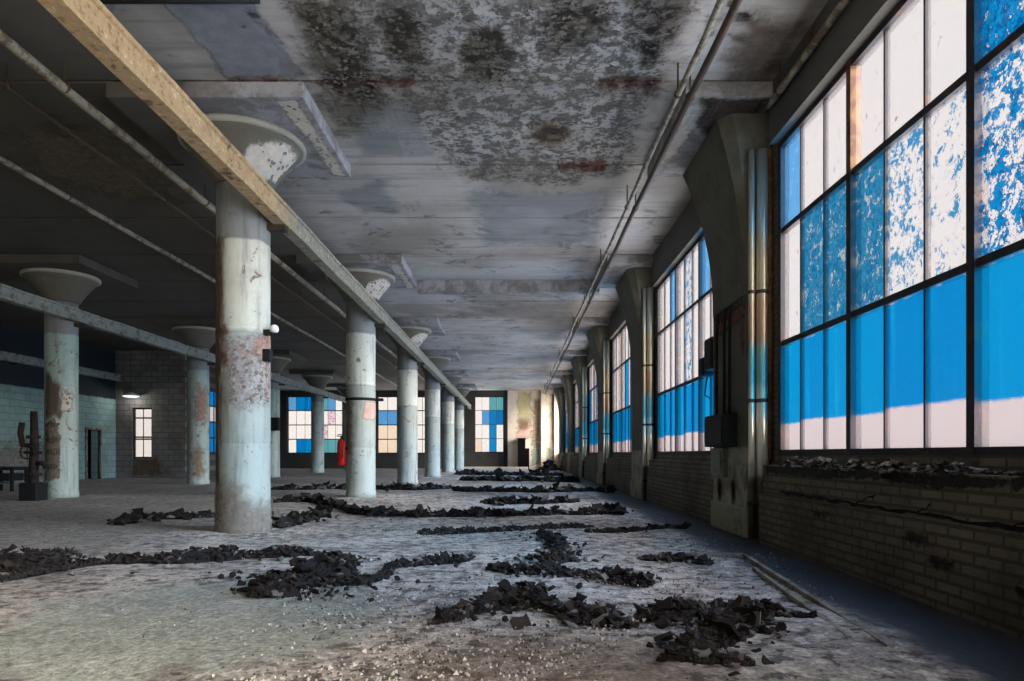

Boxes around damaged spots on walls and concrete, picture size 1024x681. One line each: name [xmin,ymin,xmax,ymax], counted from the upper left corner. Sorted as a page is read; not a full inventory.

leakage [281,0,381,126]
leakage [458,20,520,83]
peeling [298,0,697,187]
leakage [538,0,610,55]
corrosion [598,76,662,95]
peeling [245,139,296,183]
peeling [277,100,346,176]
leakage [530,121,574,145]
corrosion [555,159,608,172]
corrosion [251,335,271,398]
spalling [45,389,74,481]
crack [779,484,1024,532]